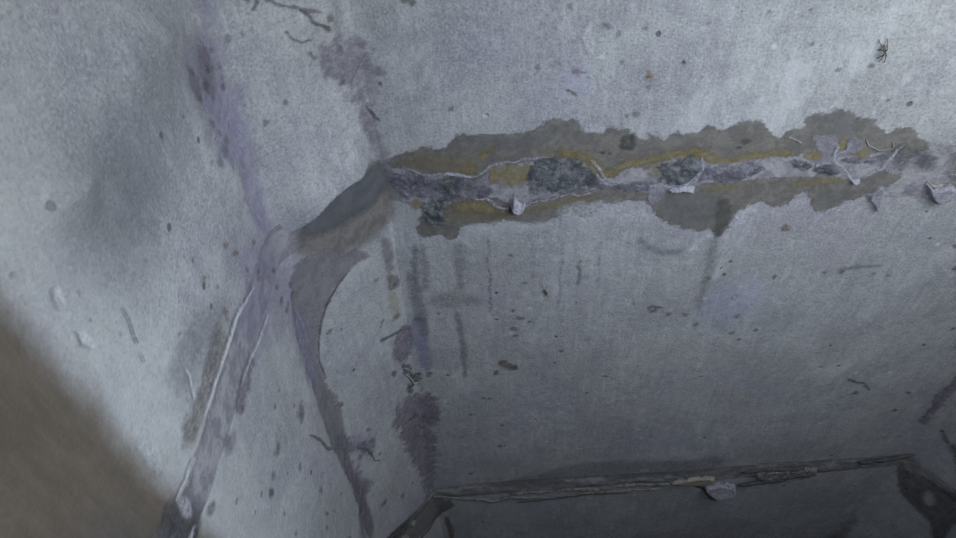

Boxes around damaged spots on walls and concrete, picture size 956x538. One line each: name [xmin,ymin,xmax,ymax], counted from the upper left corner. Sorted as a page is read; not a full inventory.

crack [287,10,331,59]
peeling [407,157,547,178]
peeling [813,135,902,185]
peeling [475,191,590,215]
peeling [636,158,704,204]
peeling [908,181,956,205]
peeling [695,481,736,501]